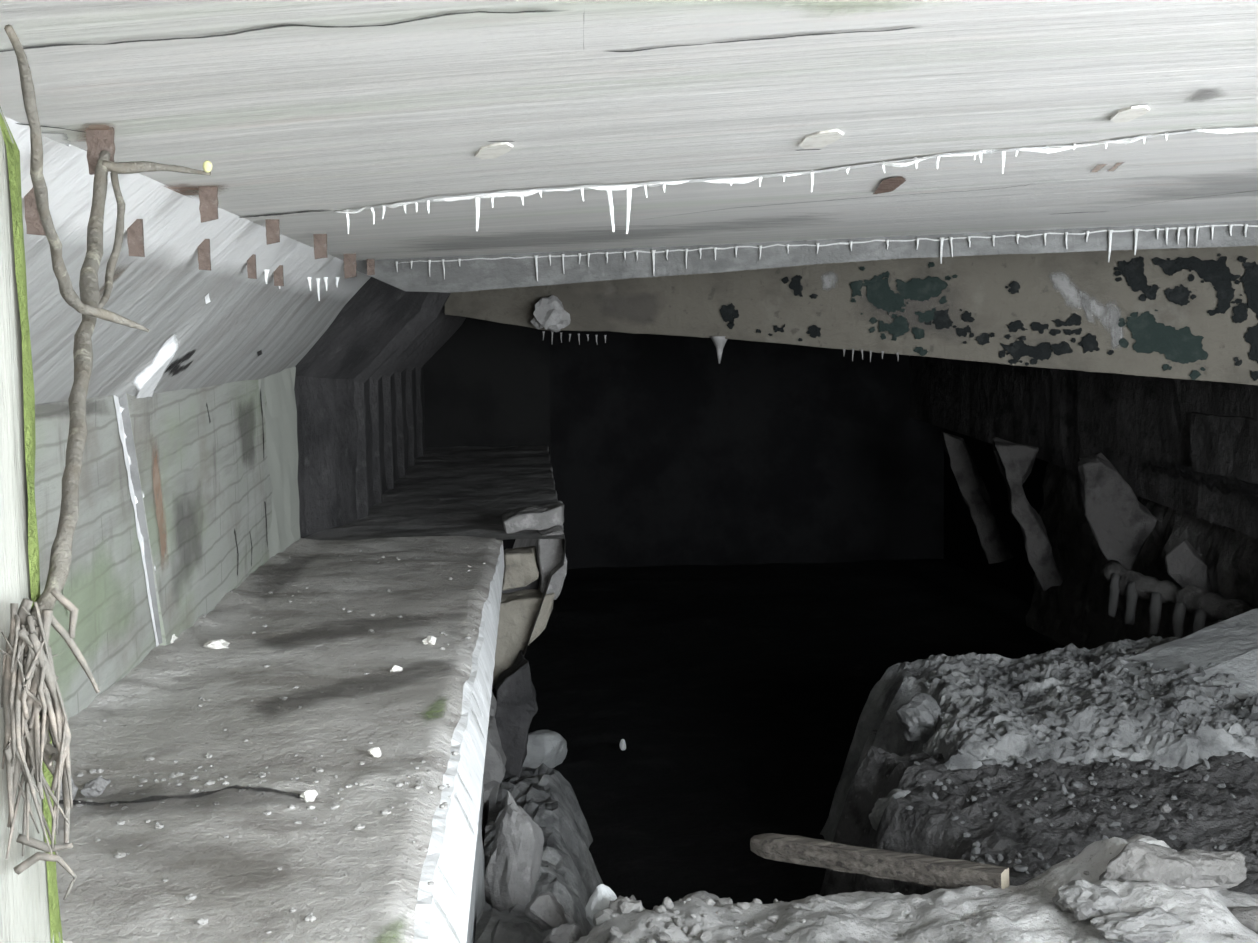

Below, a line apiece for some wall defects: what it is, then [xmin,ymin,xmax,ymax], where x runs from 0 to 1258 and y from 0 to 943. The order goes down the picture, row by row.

rust [83,124,110,141]
efflorescence [334,126,1258,234]
rust [167,187,221,196]
efflorescence [395,224,1258,281]
water stain [823,273,837,289]
peeling [849,253,1258,381]
crack [59,785,302,805]